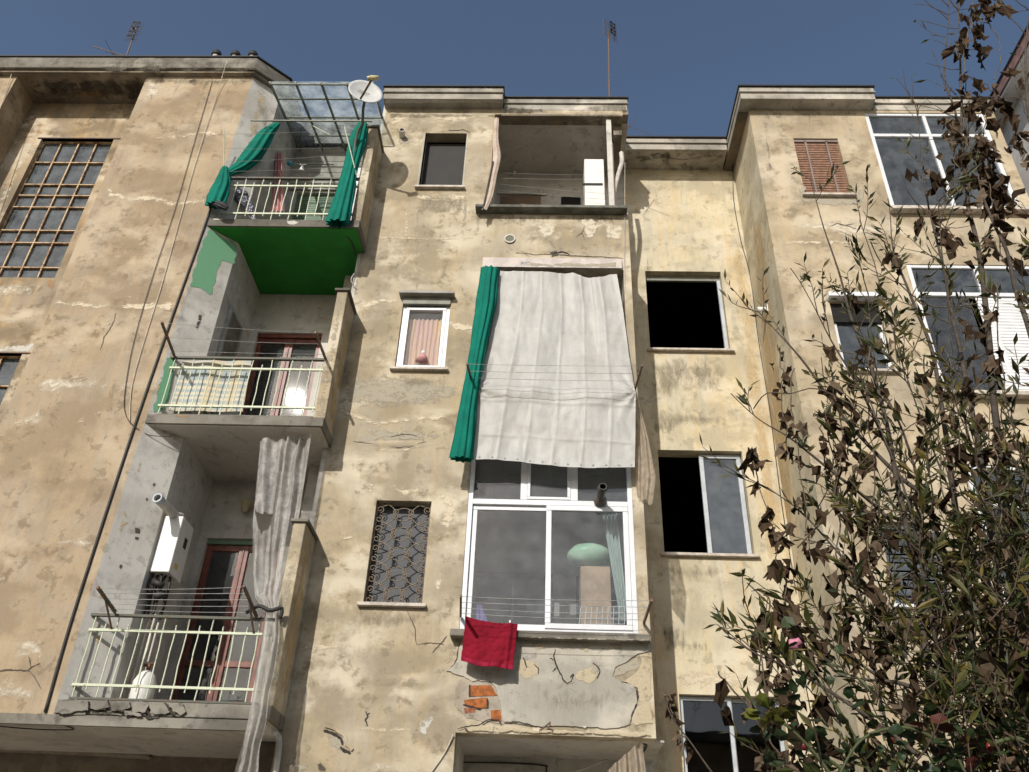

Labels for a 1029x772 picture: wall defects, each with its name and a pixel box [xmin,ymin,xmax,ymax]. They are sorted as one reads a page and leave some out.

peeling [190,218,237,295]
crack [0,657,41,688]
crack [523,649,574,685]
flaking render [447,637,653,737]
spalling [57,699,187,719]
flaking render [323,726,354,754]